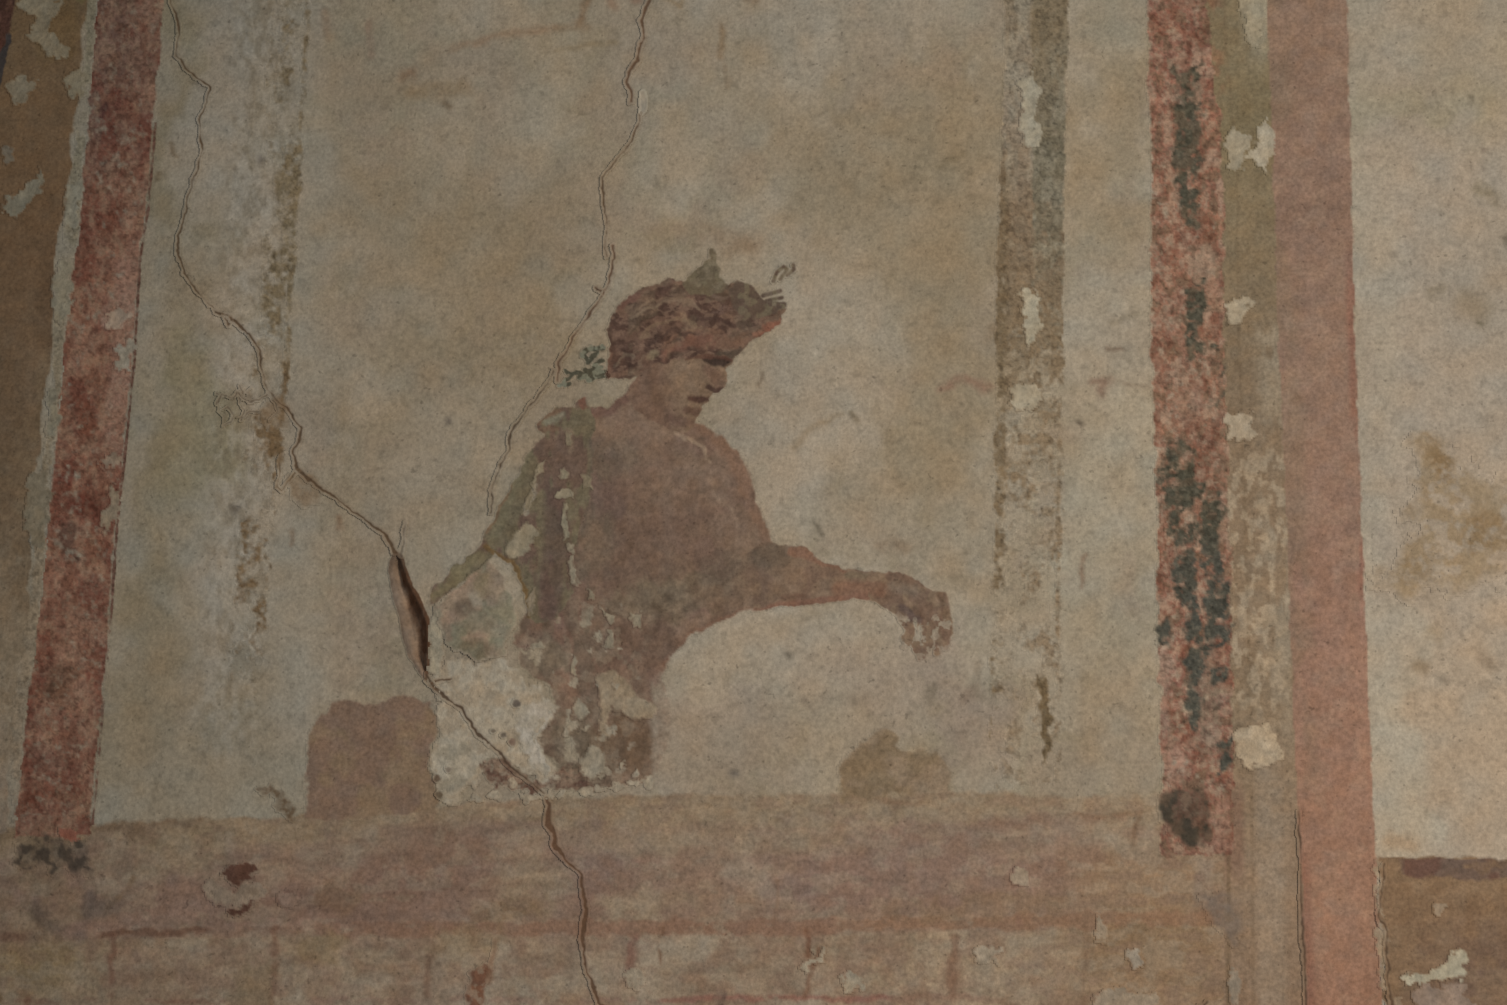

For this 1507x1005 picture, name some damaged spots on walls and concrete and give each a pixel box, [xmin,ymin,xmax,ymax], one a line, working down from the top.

spalling [14,0,88,100]
spalling [1015,66,1044,148]
spalling [1222,116,1276,176]
crack [168,0,408,559]
crack [488,0,654,515]
spalling [1016,286,1045,348]
spalling [1223,295,1258,326]
spalling [1222,410,1259,443]
spalling [504,459,643,650]
spalling [387,555,659,807]
spalling [1232,722,1285,771]
crack [423,671,609,1005]